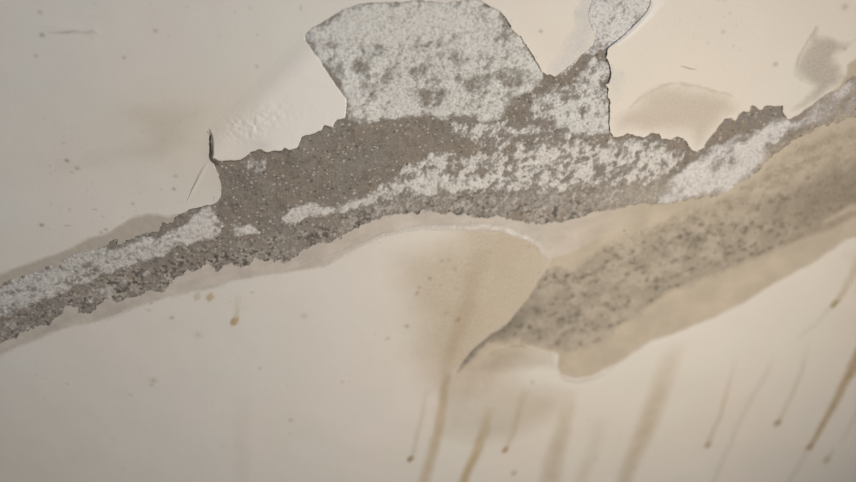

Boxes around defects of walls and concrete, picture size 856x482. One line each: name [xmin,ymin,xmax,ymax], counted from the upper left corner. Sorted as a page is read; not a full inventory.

peeling [0,0,856,382]